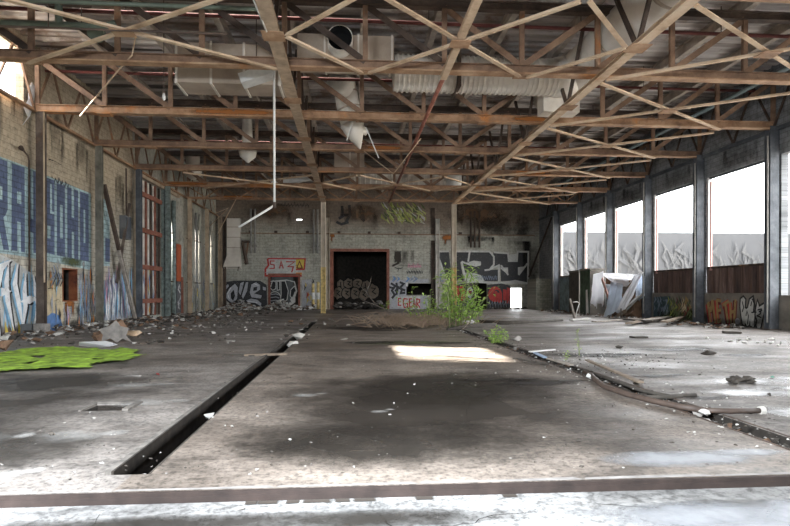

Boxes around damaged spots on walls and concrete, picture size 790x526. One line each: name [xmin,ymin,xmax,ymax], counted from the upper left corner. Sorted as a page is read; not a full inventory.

water stain [268,375,604,463]